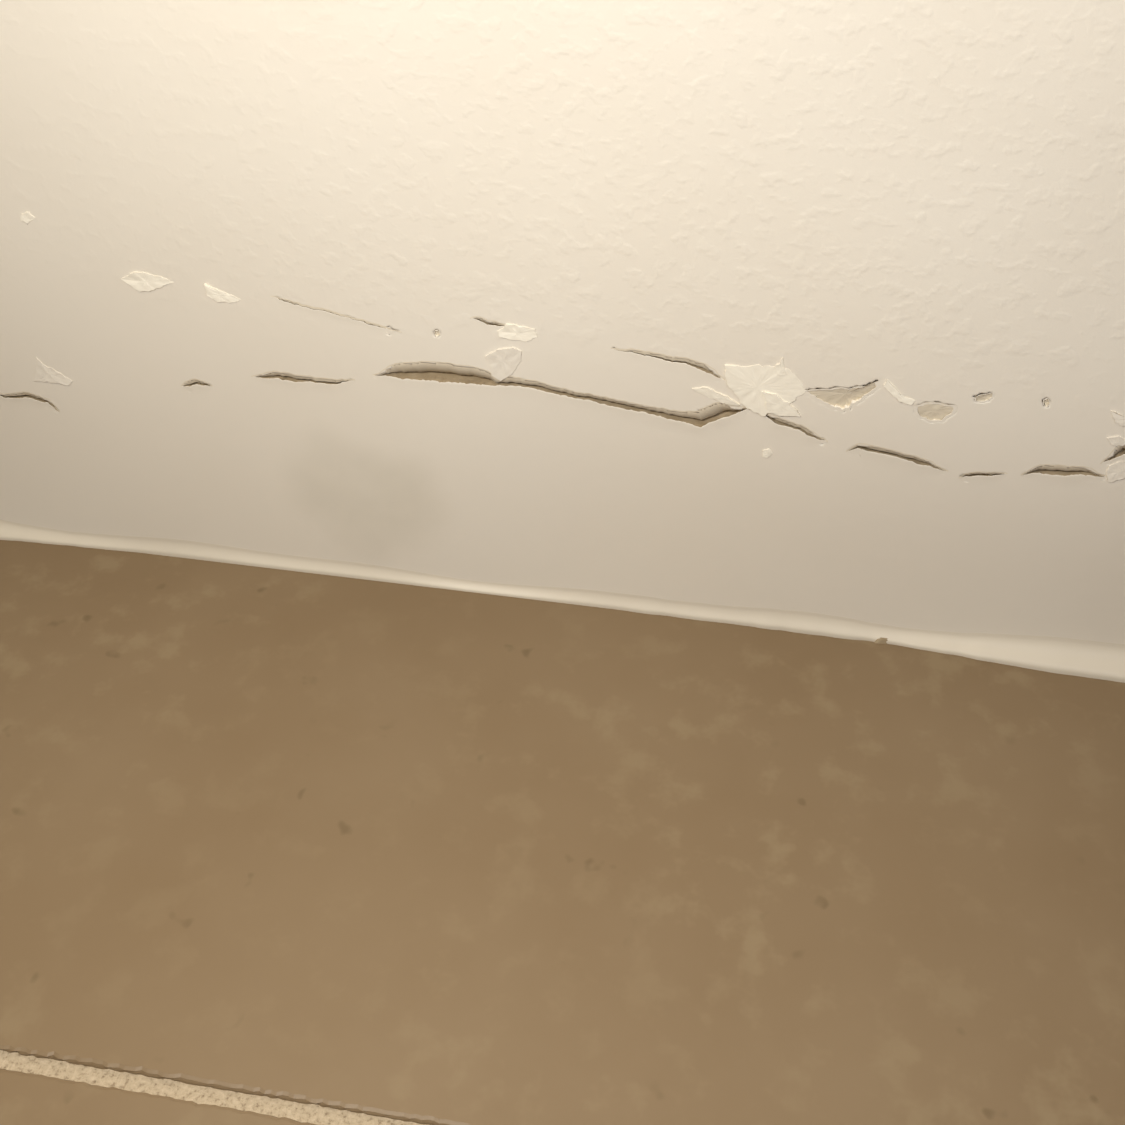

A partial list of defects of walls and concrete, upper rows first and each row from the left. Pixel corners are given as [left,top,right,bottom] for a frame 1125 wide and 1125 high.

peeling [121,271,173,292]
peeling [204,283,240,303]
crack [271,296,401,335]
crack [0,391,60,413]
crack [251,347,1125,488]
peeling [692,358,957,423]